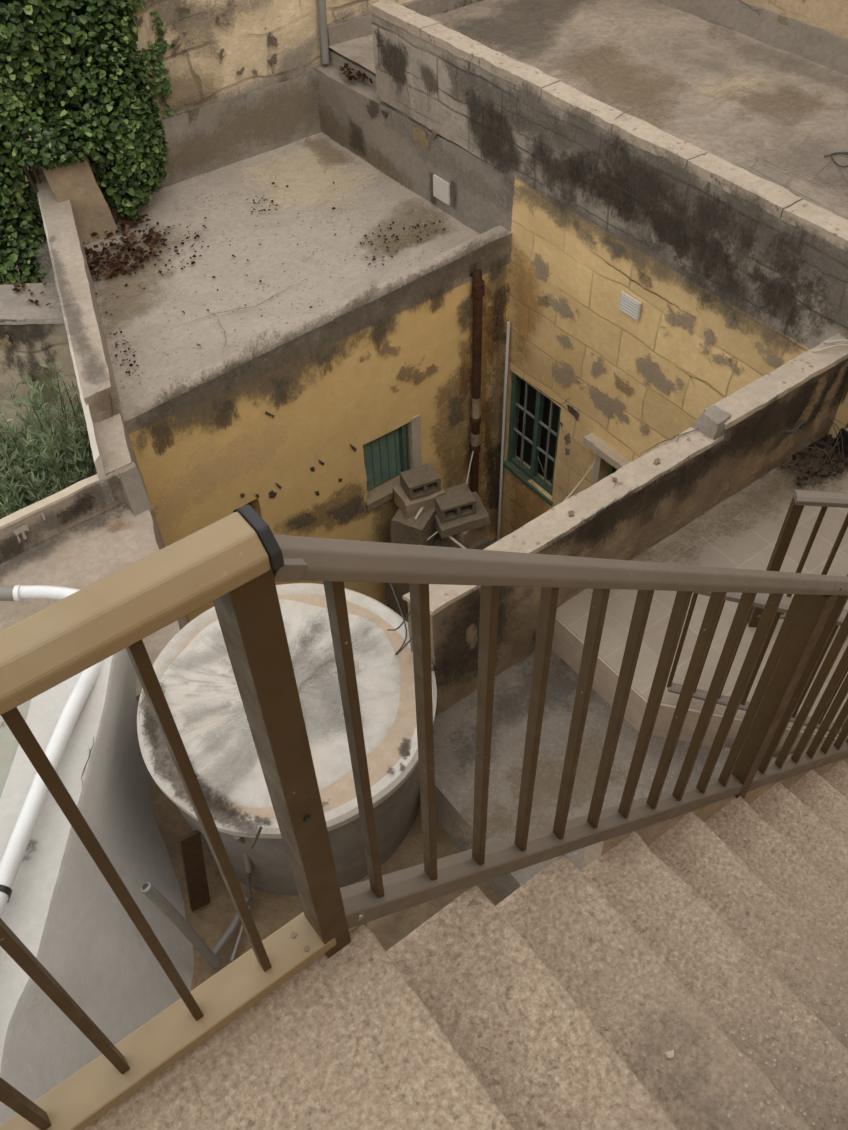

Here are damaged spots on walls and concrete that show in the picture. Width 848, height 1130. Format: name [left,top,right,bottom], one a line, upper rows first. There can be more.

leakage [375,31,407,93]
leakage [421,65,437,95]
leakage [362,173,456,255]
leakage [443,58,848,352]
leakage [93,233,180,327]
leakage [138,233,509,532]
leakage [292,617,346,734]
leakage [142,709,157,747]
leakage [186,706,270,825]
leakage [387,738,411,774]